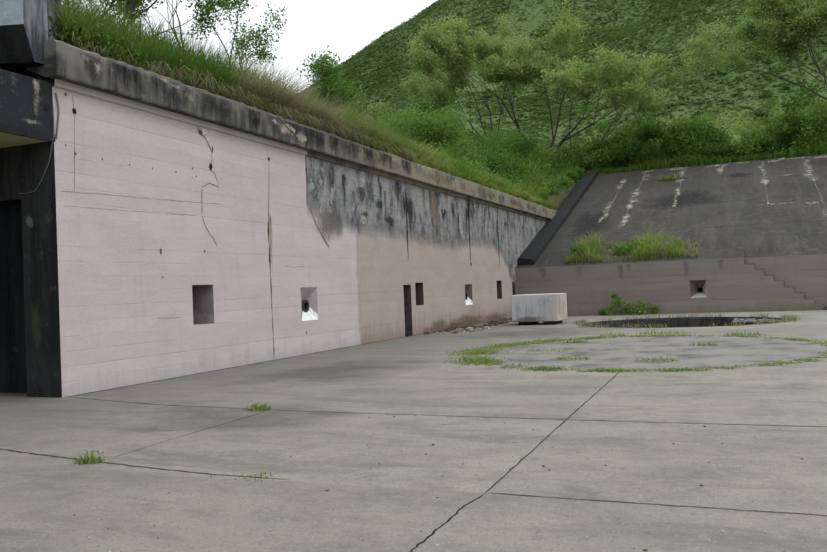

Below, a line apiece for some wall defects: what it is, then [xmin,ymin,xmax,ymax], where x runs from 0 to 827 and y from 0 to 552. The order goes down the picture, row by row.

crack [69,97,77,191]
crack [199,129,219,187]
leakage [290,123,338,149]
crack [267,203,275,348]
crack [410,495,482,552]